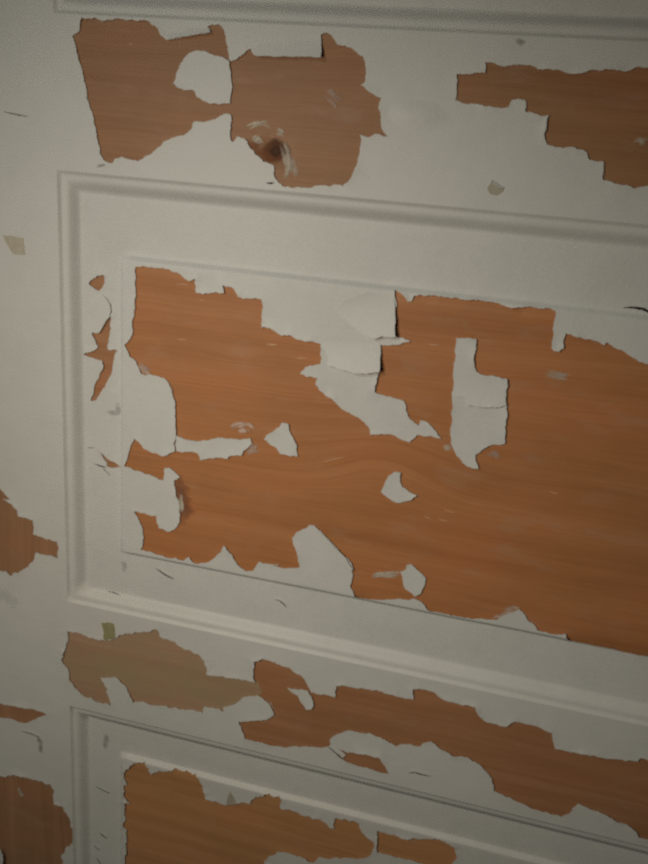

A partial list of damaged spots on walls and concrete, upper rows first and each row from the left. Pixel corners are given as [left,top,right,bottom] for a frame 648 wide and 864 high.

peeling [73,18,387,188]
peeling [456,62,648,189]
peeling [487,180,505,195]
peeling [84,266,648,656]
peeling [0,489,59,576]
peeling [0,703,46,723]
peeling [62,622,648,839]
peeling [0,775,73,864]
peeling [123,762,457,864]